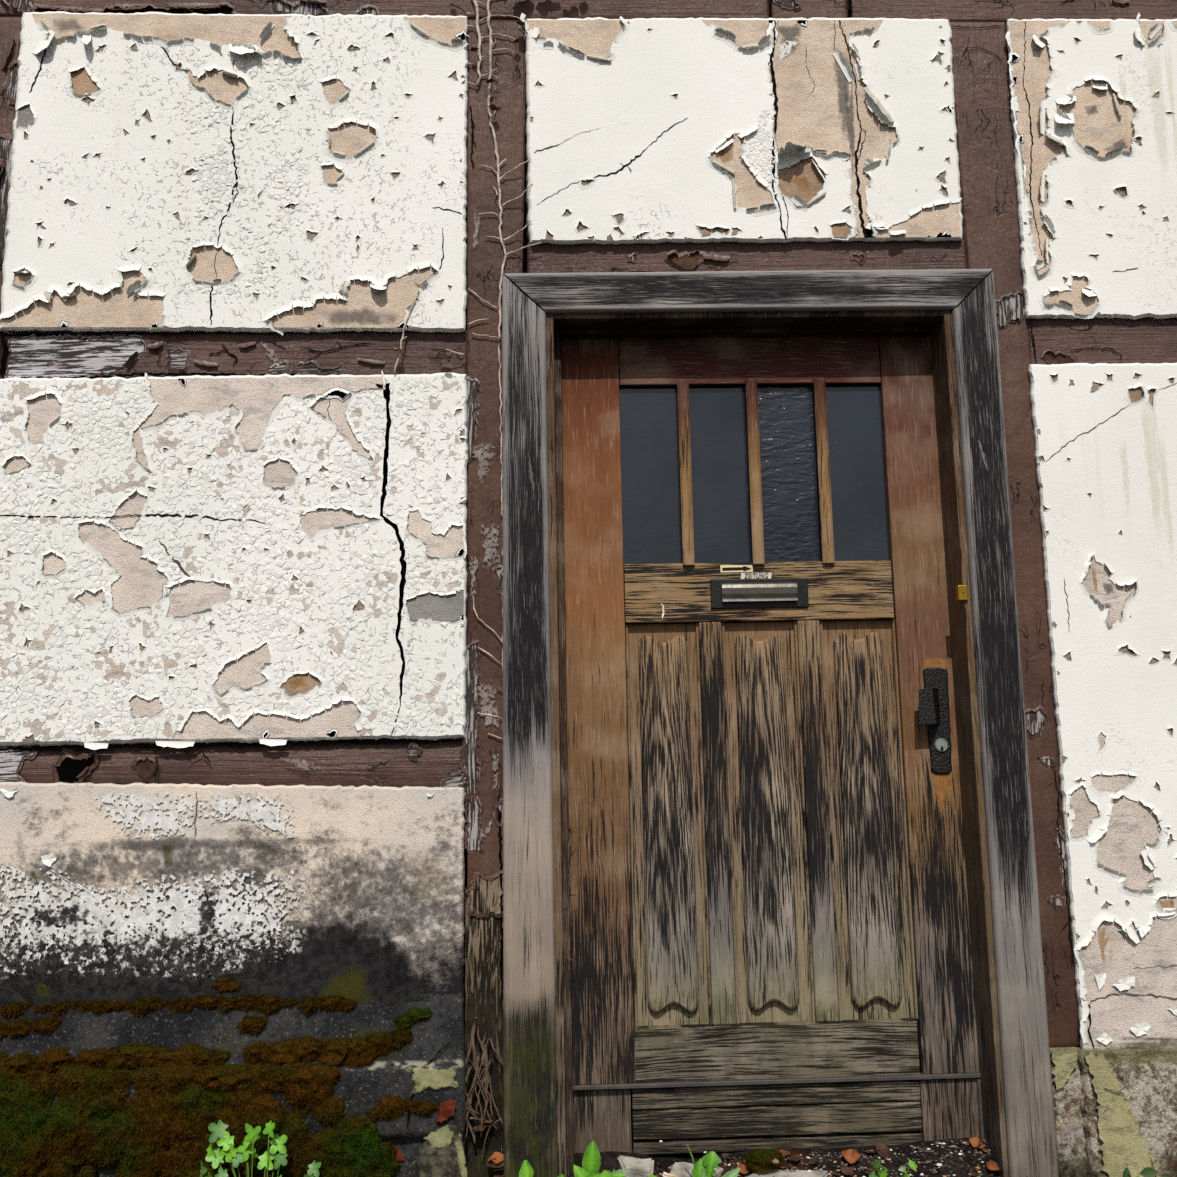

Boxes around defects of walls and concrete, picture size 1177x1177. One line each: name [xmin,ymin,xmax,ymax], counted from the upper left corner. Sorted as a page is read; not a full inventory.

crack [0,107,371,436]
peeling [520,13,630,66]
crack [537,118,687,205]
crack [768,0,789,239]
peeling [664,0,962,272]
crack [806,0,868,238]
peeling [995,20,1146,329]
peeling [0,0,503,854]
crack [0,383,462,782]
water stain [0,836,448,1014]
water stain [204,798,251,814]
peeling [1046,770,1177,1049]